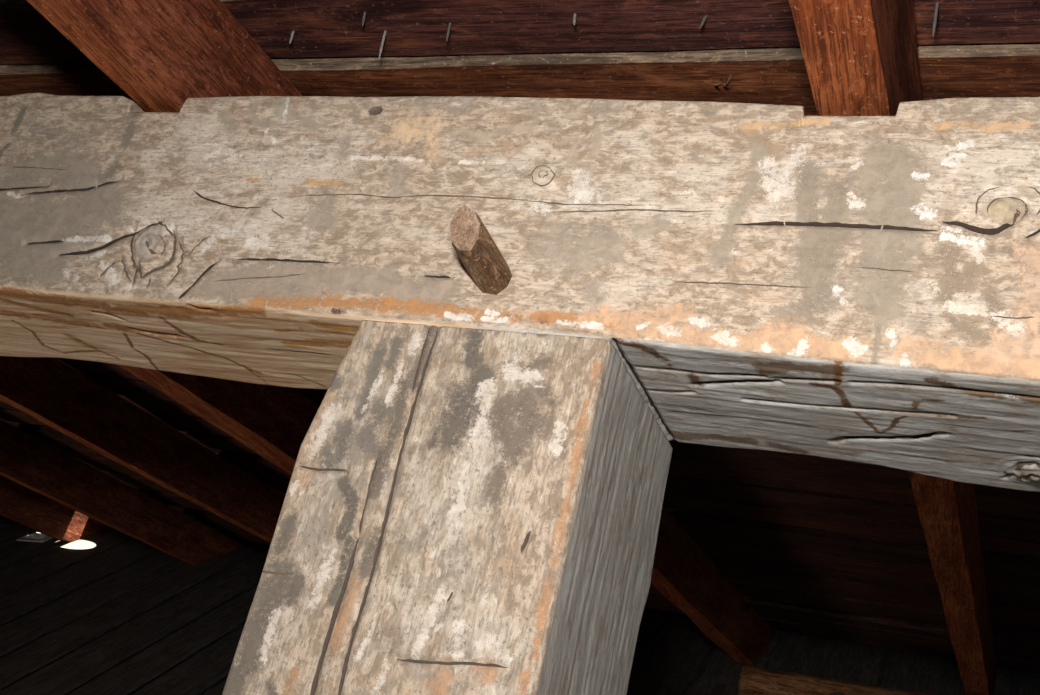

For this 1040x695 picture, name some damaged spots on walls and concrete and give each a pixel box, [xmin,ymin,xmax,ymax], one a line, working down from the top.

crack [0,167,120,194]
crack [28,221,162,256]
crack [735,221,1040,238]
crack [266,348,331,387]
crack [650,366,1040,431]
crack [300,328,438,695]
crack [396,659,507,668]